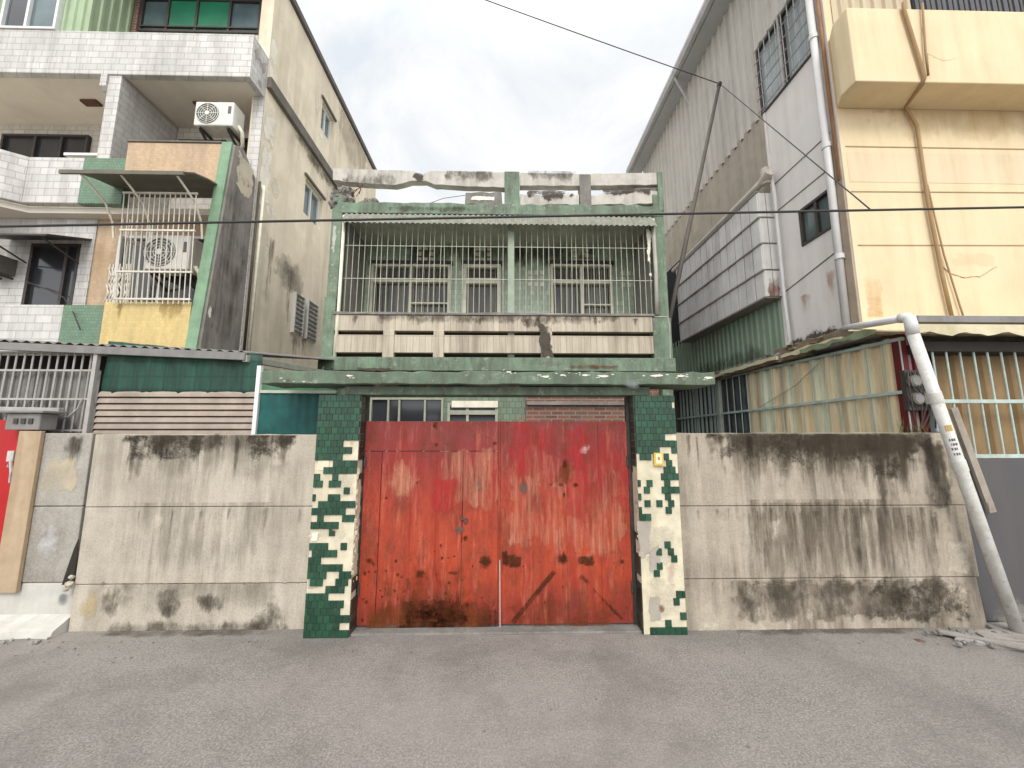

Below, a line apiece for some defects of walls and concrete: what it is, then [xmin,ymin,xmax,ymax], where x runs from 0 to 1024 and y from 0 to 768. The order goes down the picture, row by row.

peeling [235,150,254,198]
spalling [328,186,379,209]
spalling [538,324,554,358]
leakage [123,434,222,459]
leakage [235,435,297,457]
leakage [727,433,950,510]
rust [502,551,524,567]
spalling [635,499,681,627]
rust [361,572,497,628]
rust [512,552,594,624]
leakage [742,580,797,630]
leakage [821,577,950,622]